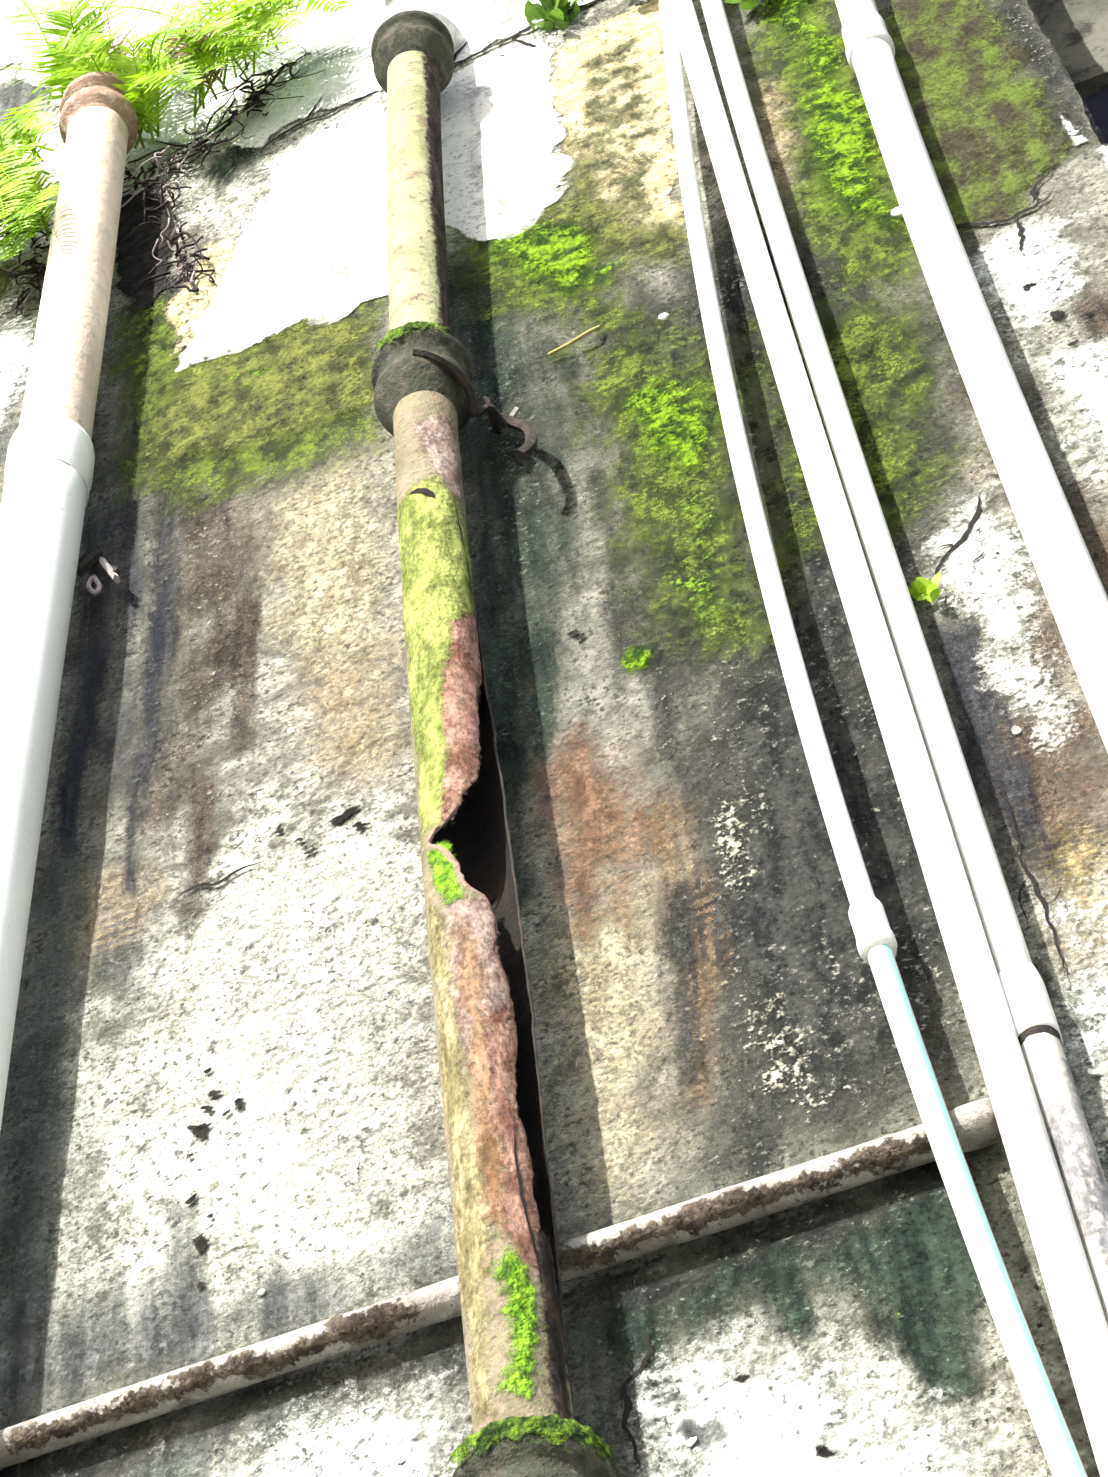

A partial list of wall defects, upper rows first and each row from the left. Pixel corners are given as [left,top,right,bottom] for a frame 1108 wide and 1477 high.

crack [453,0,597,64]
peeling [0,0,686,372]
crack [956,168,1054,253]
leakage [0,273,458,1426]
corrosion [539,724,715,974]
leakage [447,254,919,1196]
leakage [710,201,971,1088]
leakage [782,195,1065,894]
crack [934,491,986,576]
crack [1001,787,1071,991]
crack [619,1320,654,1476]
leakage [563,1161,983,1458]